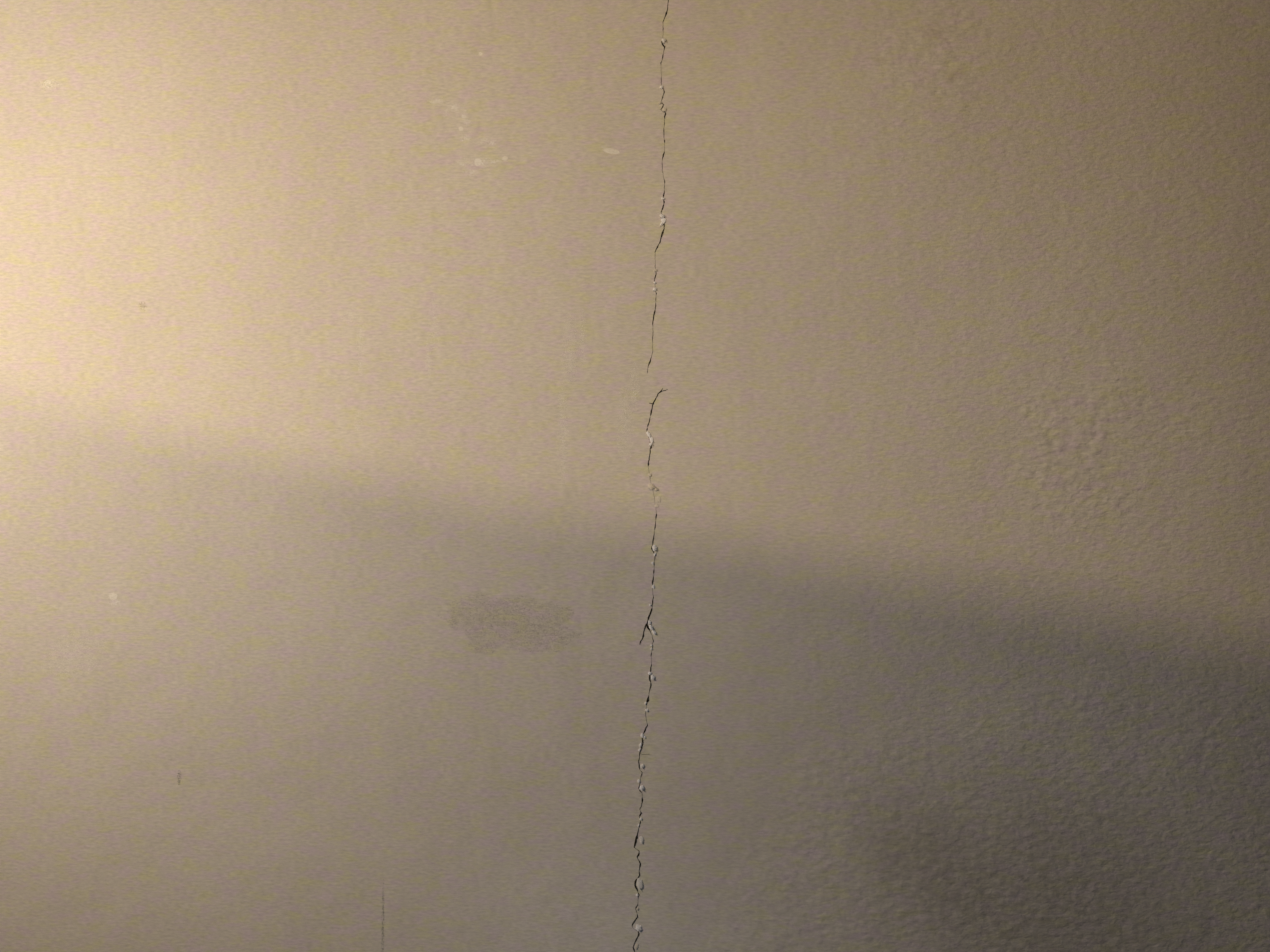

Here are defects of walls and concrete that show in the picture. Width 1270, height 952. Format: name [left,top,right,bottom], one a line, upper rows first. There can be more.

crack [632,0,669,952]